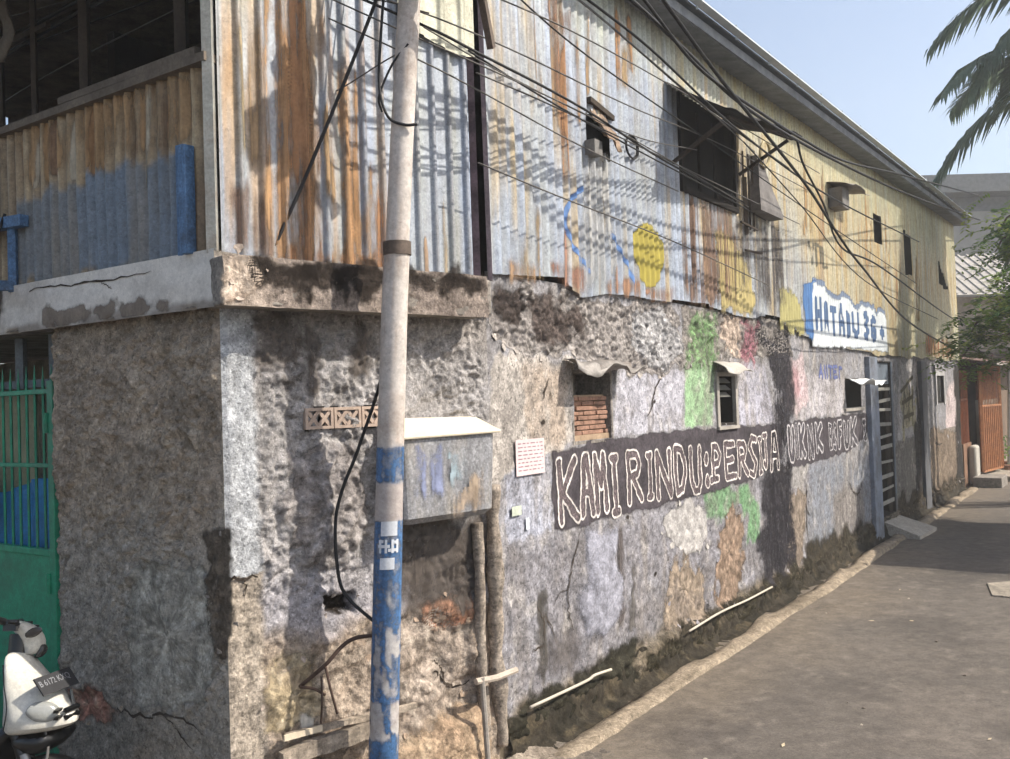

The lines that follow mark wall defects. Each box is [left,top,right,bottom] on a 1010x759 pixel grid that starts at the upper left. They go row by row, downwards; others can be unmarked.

rust [14,77,192,187]
rust [232,0,385,267]
rust [548,0,589,174]
crack [29,271,150,292]
damp [247,252,383,306]
peeling [67,527,239,725]
crack [117,708,200,750]